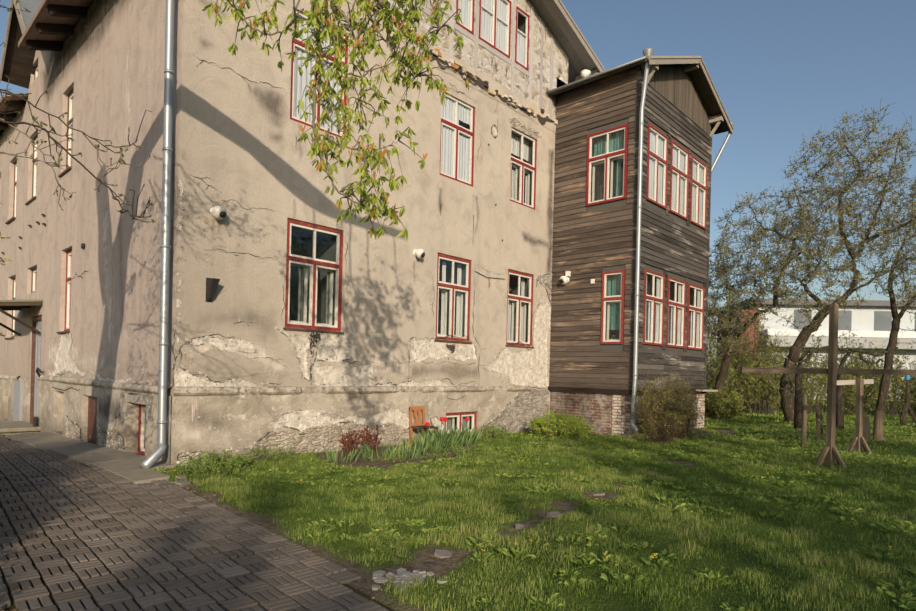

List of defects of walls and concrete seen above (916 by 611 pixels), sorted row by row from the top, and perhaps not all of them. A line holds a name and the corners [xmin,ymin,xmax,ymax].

crack [197,57,279,89]
damp [261,94,279,116]
flaking render [354,0,558,138]
spalling [48,329,152,395]
crack [169,319,252,385]
spalling [176,273,259,353]
crack [206,249,285,321]
spalling [170,327,479,466]
crack [306,264,502,385]
spalling [408,272,552,433]